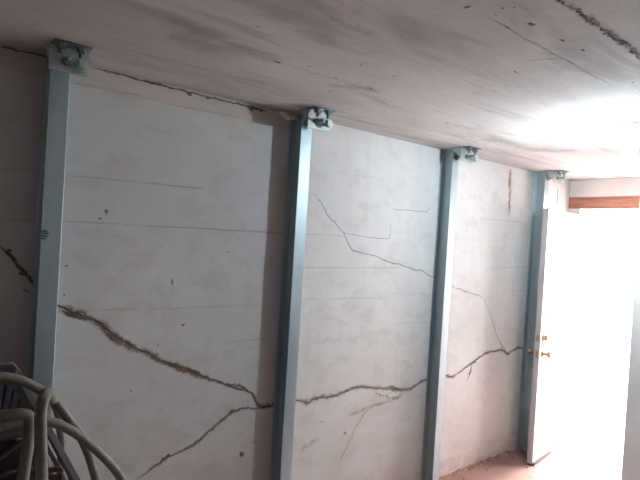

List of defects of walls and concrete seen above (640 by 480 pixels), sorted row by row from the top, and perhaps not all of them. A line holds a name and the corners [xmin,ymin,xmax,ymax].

crack [2,47,46,57]
crack [556,0,640,60]
crack [90,67,265,112]
crack [315,195,432,277]
crack [0,247,34,292]
crack [445,321,521,381]
crack [57,304,274,480]
crack [296,379,427,405]